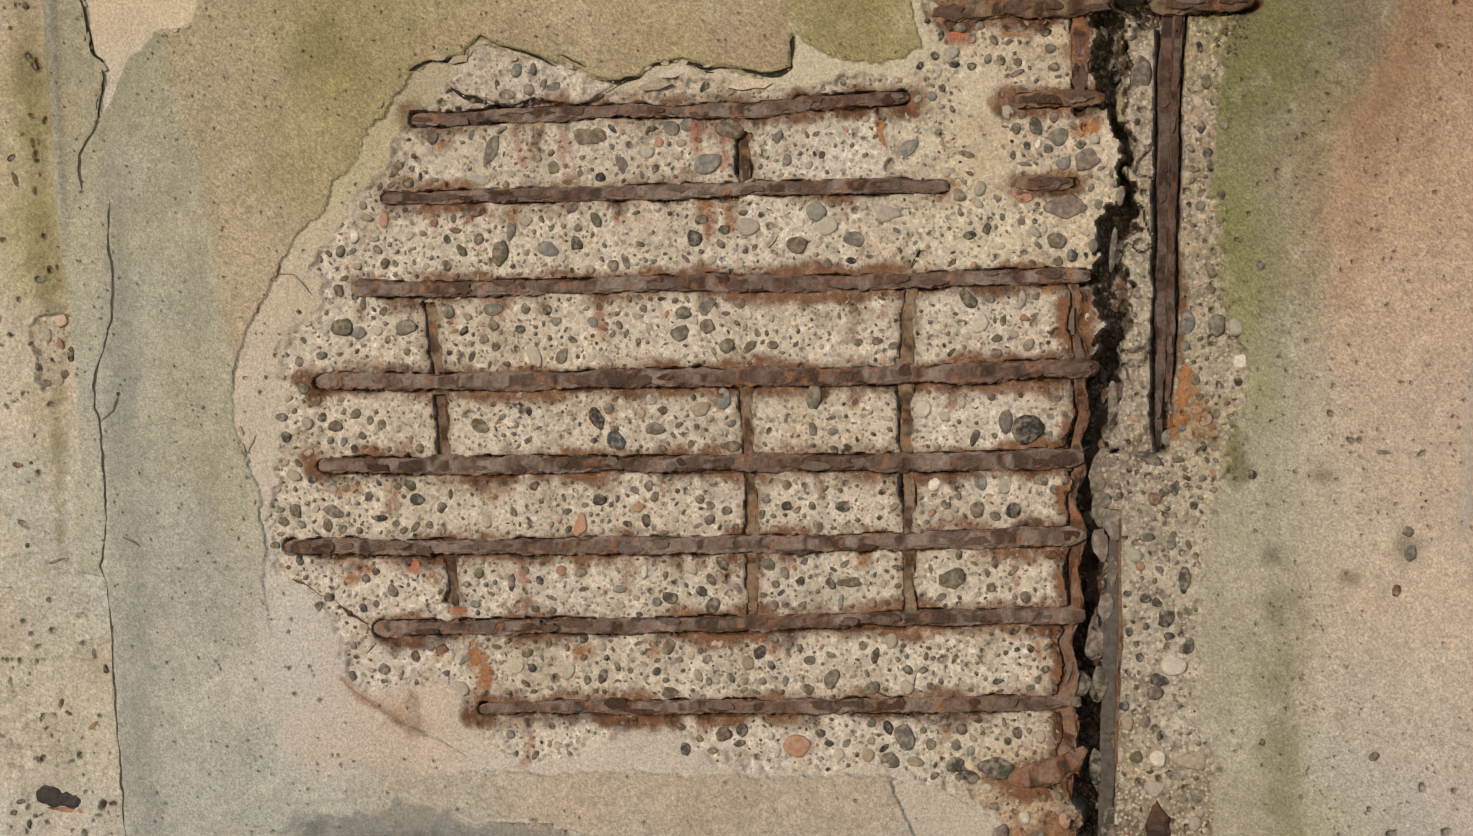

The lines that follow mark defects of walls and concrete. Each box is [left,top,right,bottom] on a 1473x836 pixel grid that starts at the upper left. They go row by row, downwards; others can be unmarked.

flaking render [79,0,200,118]
corrosion [721,85,924,169]
corrosion [929,0,1112,137]
corrosion [396,179,542,222]
corrosion [430,261,934,329]
crack [77,0,141,836]
corrosion [292,366,383,405]
corrosion [440,445,769,494]
corrosion [402,355,879,414]
spalling [230,0,1260,836]
corrosion [652,262,1096,836]
corrosion [378,530,980,734]